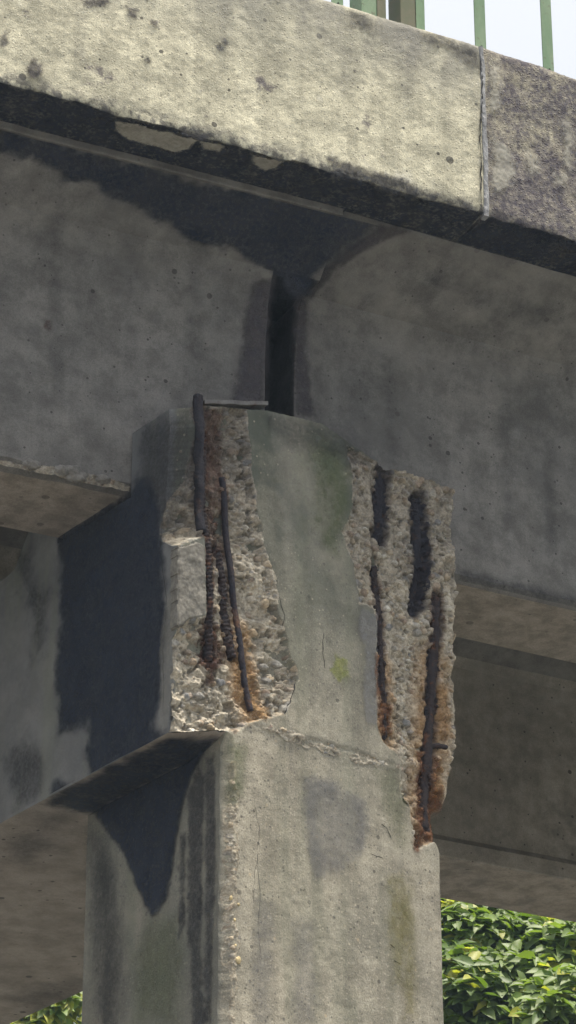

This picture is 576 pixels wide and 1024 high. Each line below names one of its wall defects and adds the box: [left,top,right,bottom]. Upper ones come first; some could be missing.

water stain [0,82,576,416]
spalling [159,393,300,735]
rust [196,625,267,718]
rust [376,655,393,734]
spalling [340,446,459,849]
rust [414,751,444,852]